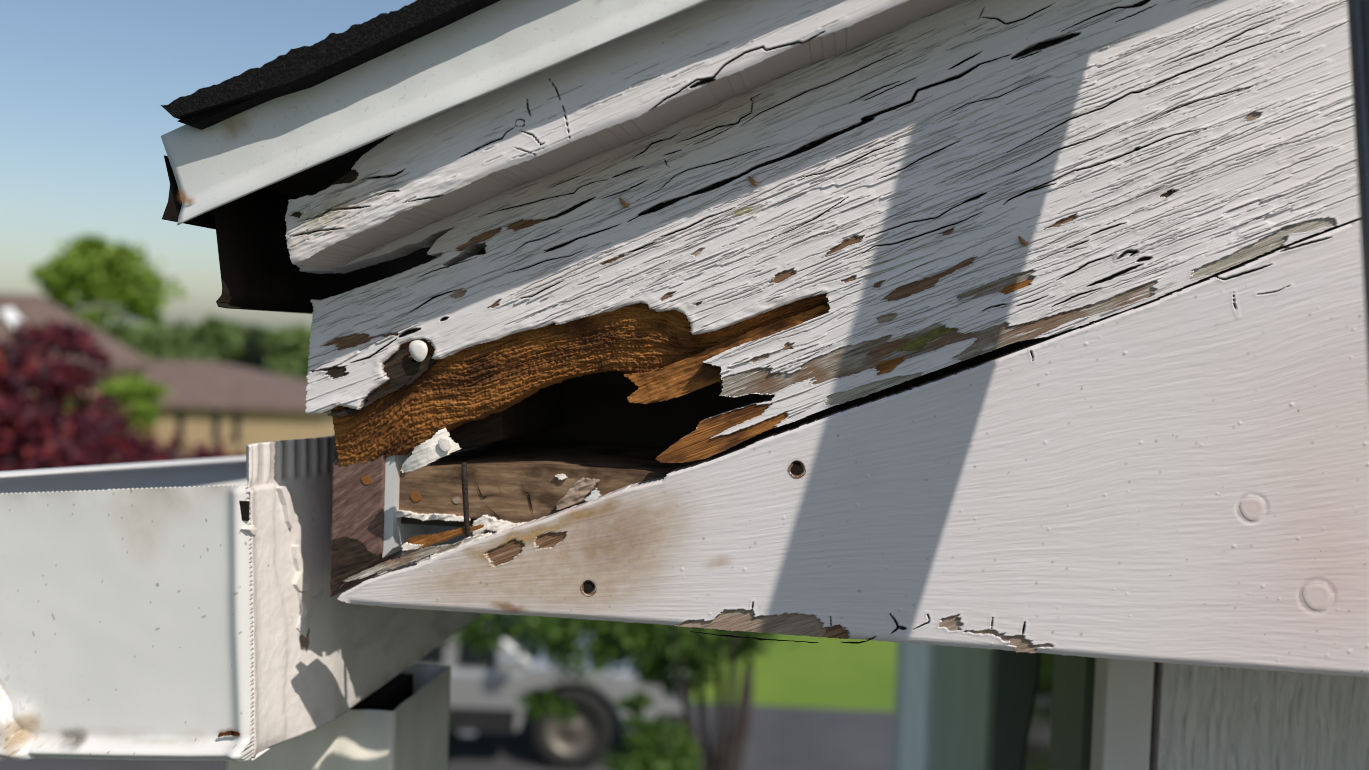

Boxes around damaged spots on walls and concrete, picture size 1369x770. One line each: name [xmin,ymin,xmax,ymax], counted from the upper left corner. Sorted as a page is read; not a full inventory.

crack [461,85,570,157]
crack [488,0,1155,309]
crack [862,21,1299,254]
crack [298,169,444,235]
crack [1215,238,1326,309]
crack [351,258,474,363]
peeling [308,332,398,379]
peeling [656,257,1157,463]
peeling [400,428,461,473]
peeling [486,531,567,566]
peeling [674,609,850,639]
peeling [939,614,1052,653]